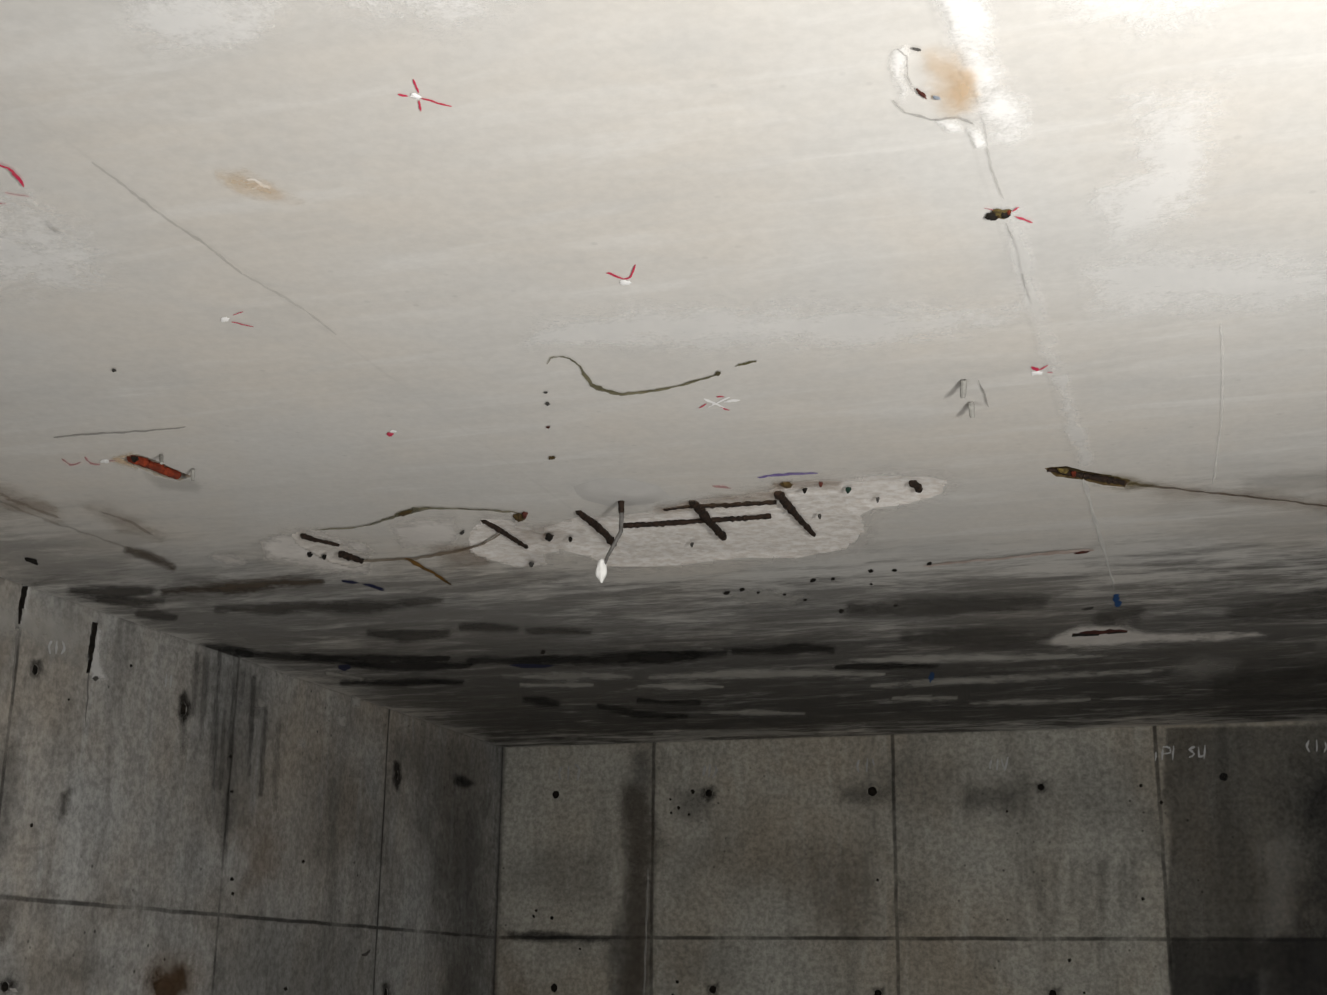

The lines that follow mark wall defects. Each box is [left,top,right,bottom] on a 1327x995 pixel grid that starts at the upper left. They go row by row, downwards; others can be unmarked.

crack [940,0,1028,141]
crack [547,356,756,396]
spalling [392,475,947,567]
damp [126,548,175,570]
spalling [262,529,371,573]
damp [70,579,442,621]
damp [849,597,1041,615]
damp [205,623,1160,736]
damp [510,932,607,942]
rust [148,965,187,995]